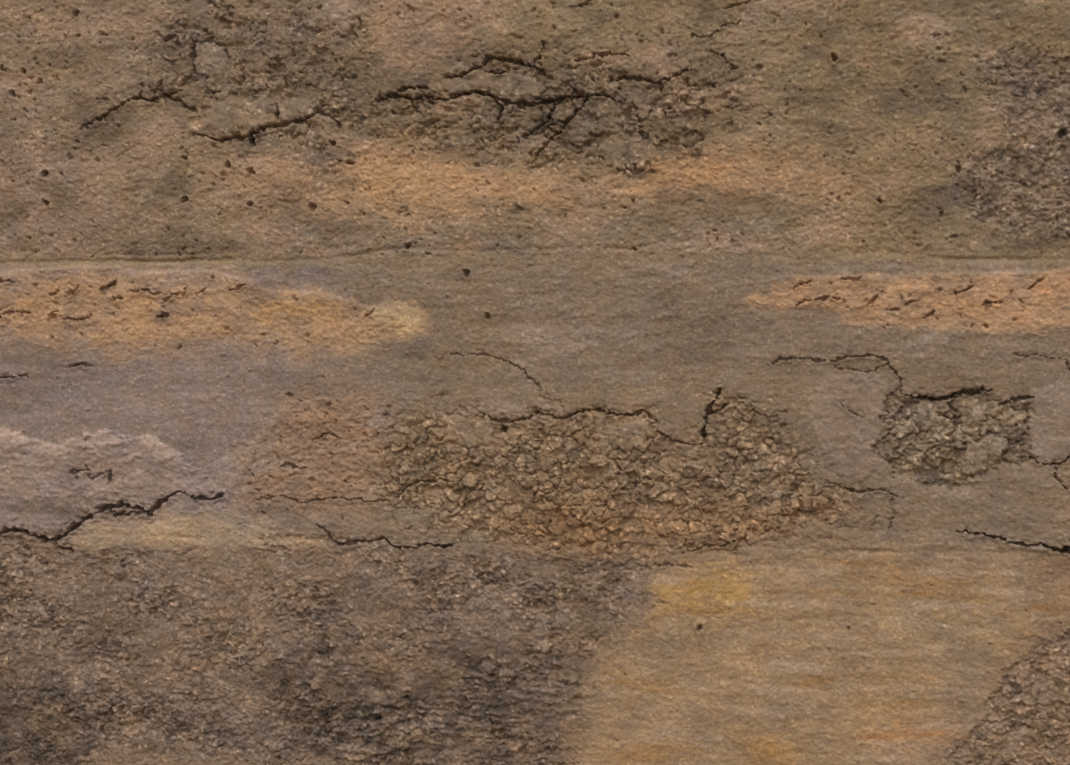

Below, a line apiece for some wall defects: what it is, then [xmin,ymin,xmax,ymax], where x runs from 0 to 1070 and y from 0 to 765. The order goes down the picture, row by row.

crack [78,78,342,141]
crack [190,42,231,62]
crack [372,0,758,166]
crack [767,353,1033,415]
crack [1011,351,1070,373]
spalling [872,392,1033,492]
crack [0,432,467,551]
crack [1029,455,1070,493]
crack [956,529,1070,556]
spalling [0,389,871,765]
spalling [940,626,1070,765]